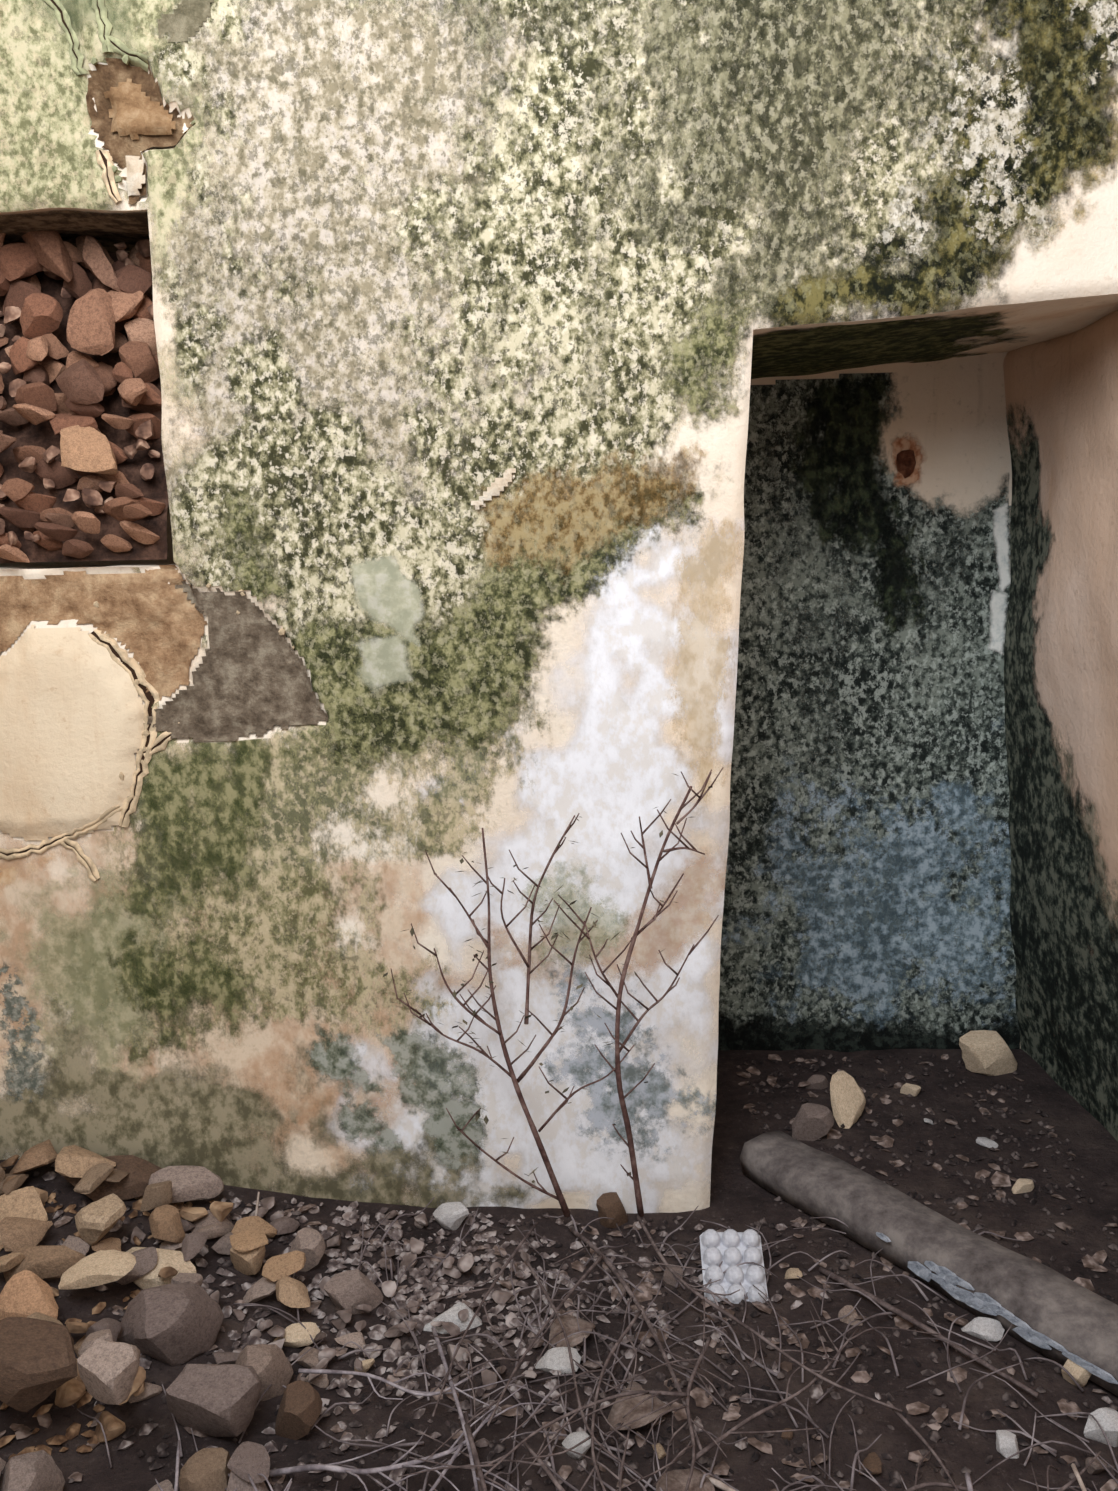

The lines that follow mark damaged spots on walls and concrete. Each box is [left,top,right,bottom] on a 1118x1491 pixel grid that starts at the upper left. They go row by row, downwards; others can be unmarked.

spalling [86,55,195,204]
water stain [0,210,149,252]
spalling [0,565,328,742]
crack [0,629,179,882]
water stain [1059,748,1073,796]
water stain [1074,788,1118,930]
water stain [948,965,983,988]